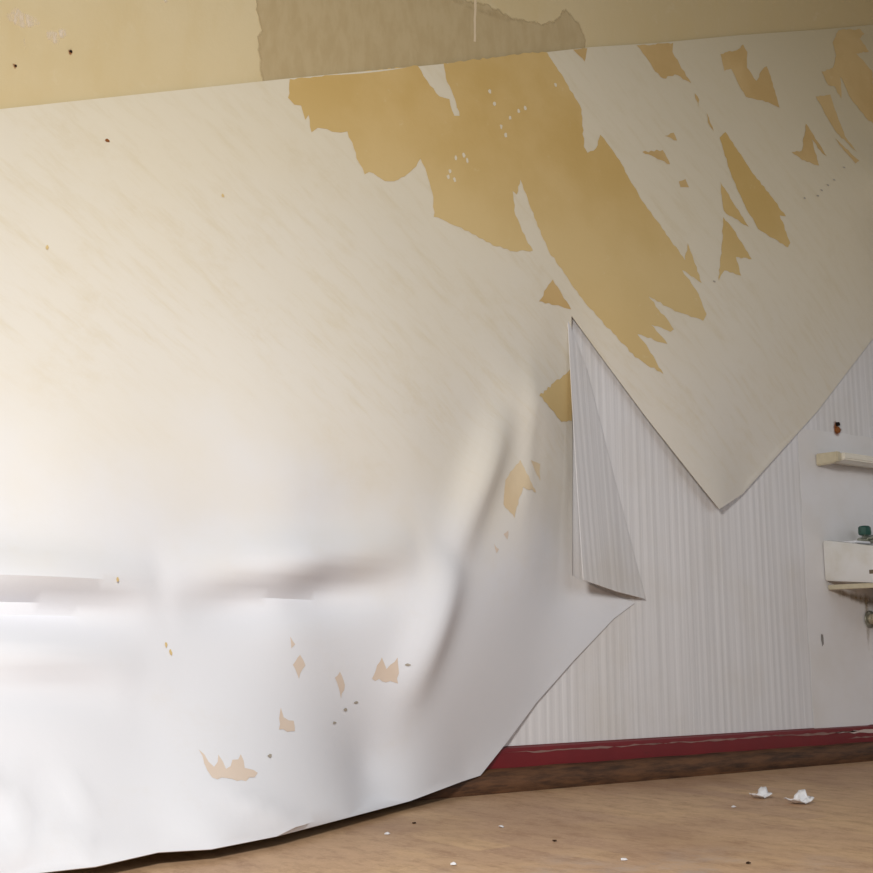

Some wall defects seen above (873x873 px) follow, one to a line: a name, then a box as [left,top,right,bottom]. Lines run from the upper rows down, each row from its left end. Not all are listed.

leakage [257,0,585,81]
peeling [520,729,873,753]